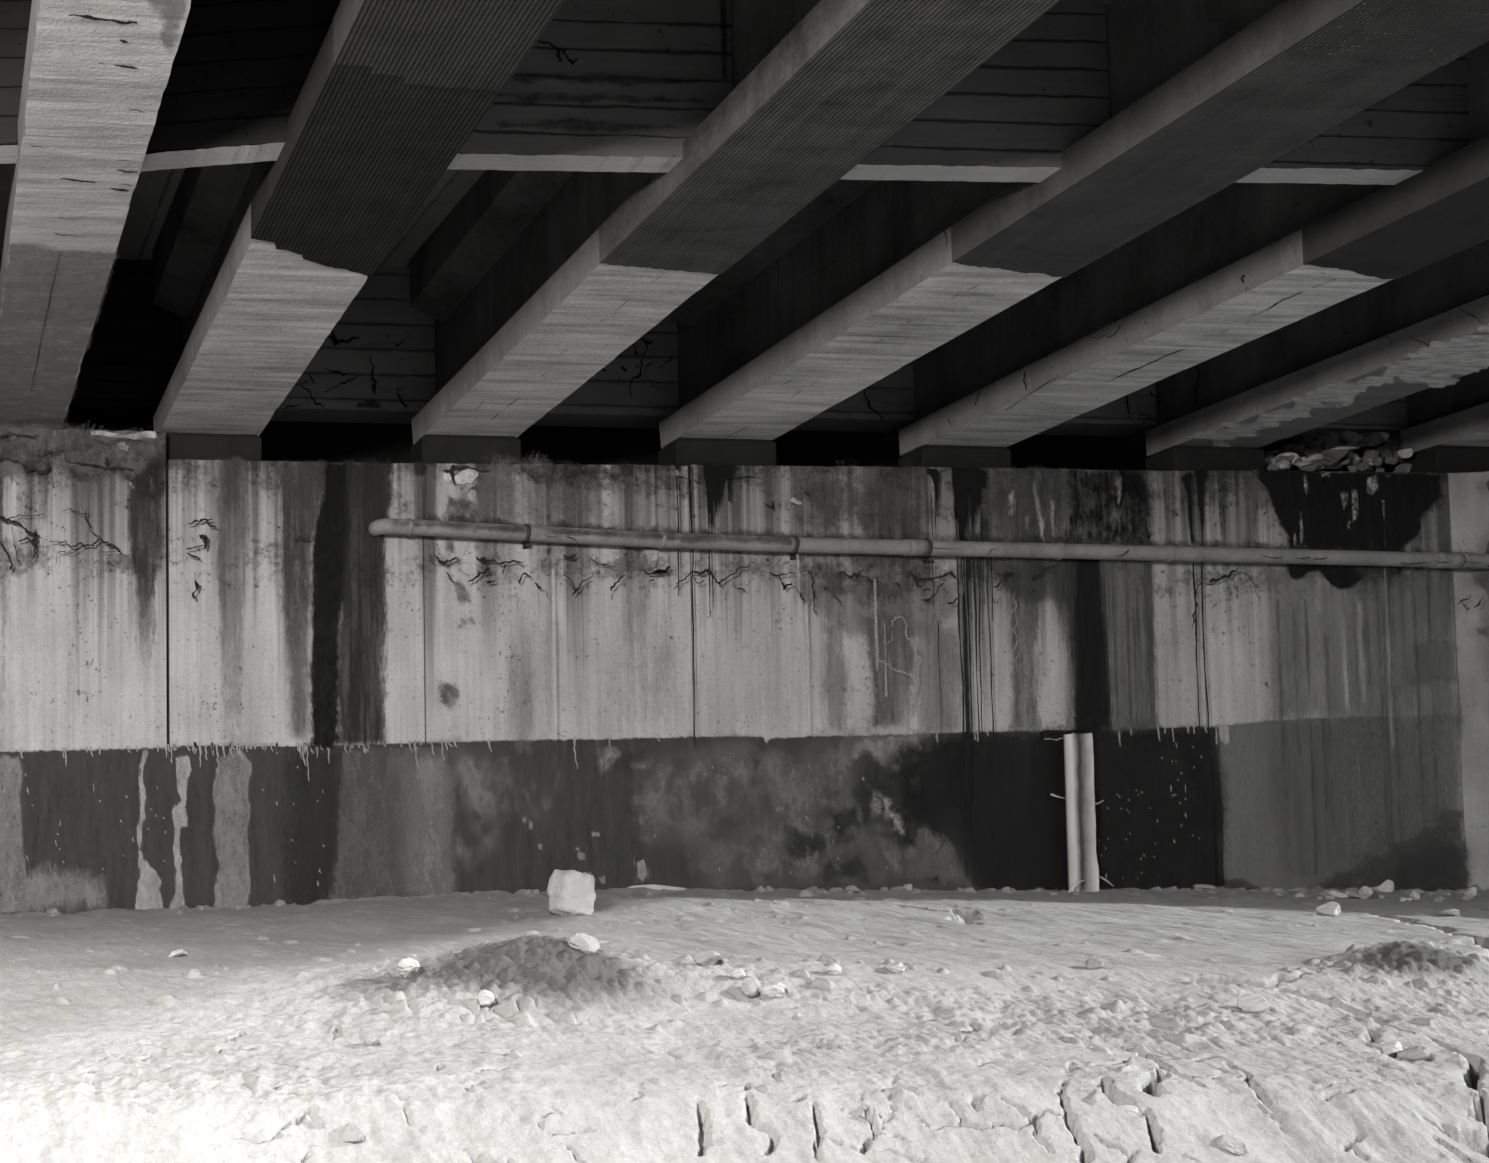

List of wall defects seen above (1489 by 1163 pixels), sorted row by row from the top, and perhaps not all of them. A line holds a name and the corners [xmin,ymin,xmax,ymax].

crack [69,0,138,69]
crack [31,145,139,192]
crack [29,217,86,398]
peeling [1189,323,1489,447]
crack [0,432,152,570]
water stain [278,460,391,904]
crack [433,536,1060,725]
water stain [796,467,1258,891]
water stain [1248,470,1470,891]